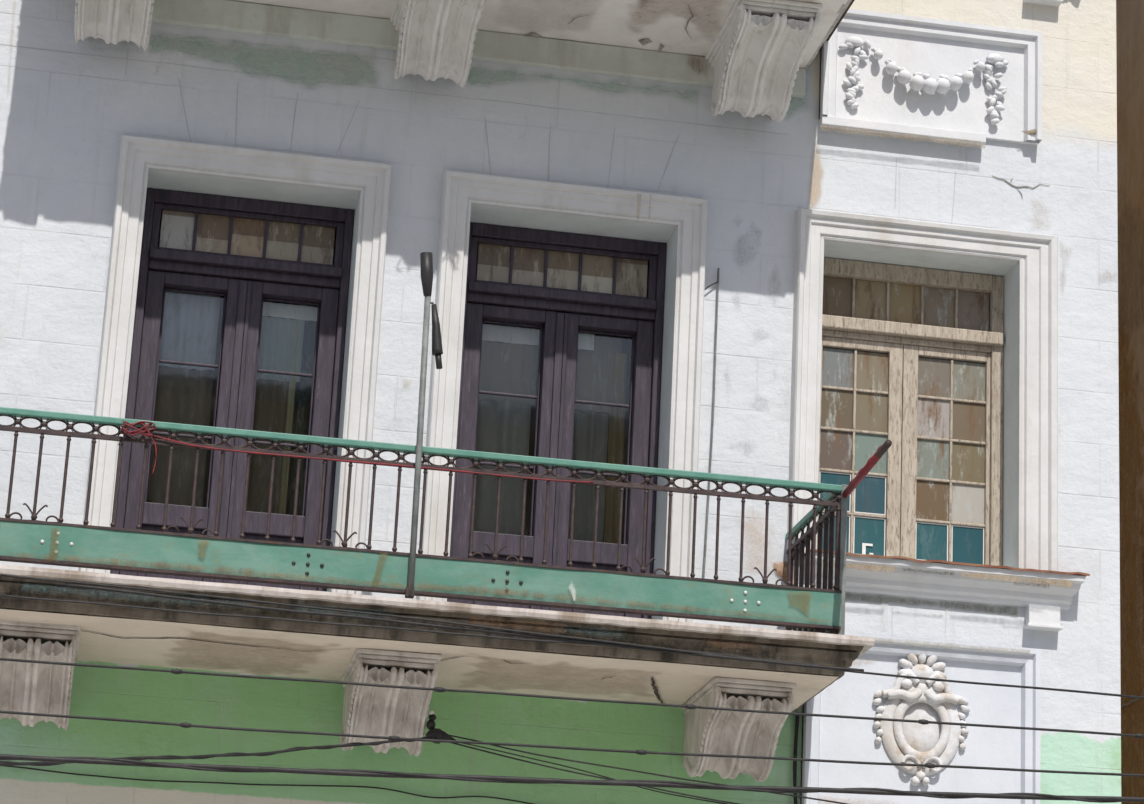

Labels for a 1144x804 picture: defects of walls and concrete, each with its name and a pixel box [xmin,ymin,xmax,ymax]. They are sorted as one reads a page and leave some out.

leakage [811,154,821,205]
crack [993,176,1049,199]
leakage [18,589,531,635]